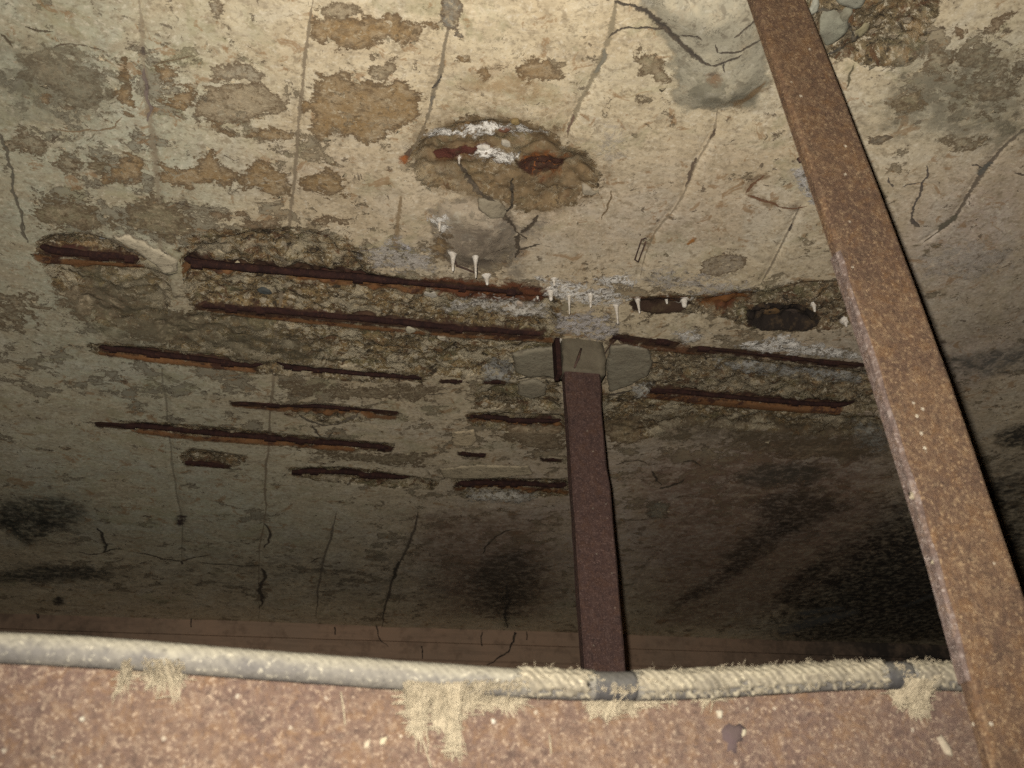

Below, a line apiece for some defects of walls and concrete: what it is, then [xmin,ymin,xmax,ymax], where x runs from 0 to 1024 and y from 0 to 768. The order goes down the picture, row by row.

crack [609,0,760,72]
spalling [154,0,604,213]
crack [0,134,29,243]
crack [887,166,929,227]
water stain [427,214,499,264]
spalling [0,125,566,463]
corrosion [297,276,547,302]
water stain [443,264,747,344]
corrosion [697,292,751,313]
spalling [628,278,851,333]
corrosion [642,392,842,415]
water stain [466,488,538,504]